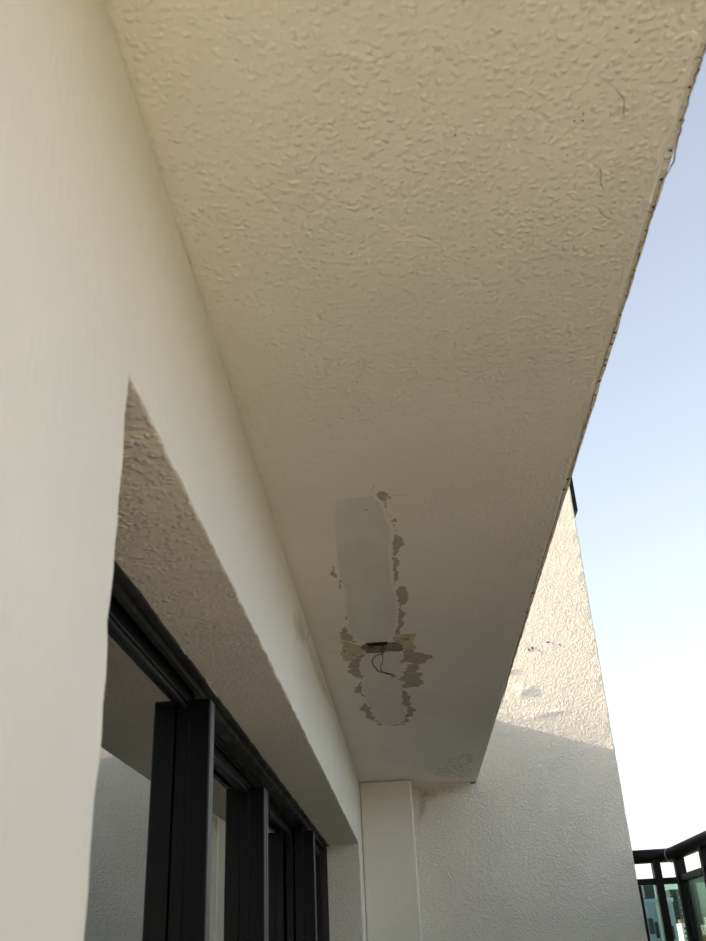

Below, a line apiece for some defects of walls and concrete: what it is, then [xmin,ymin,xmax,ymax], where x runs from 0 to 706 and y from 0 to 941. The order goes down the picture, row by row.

peeling [330,491,433,726]